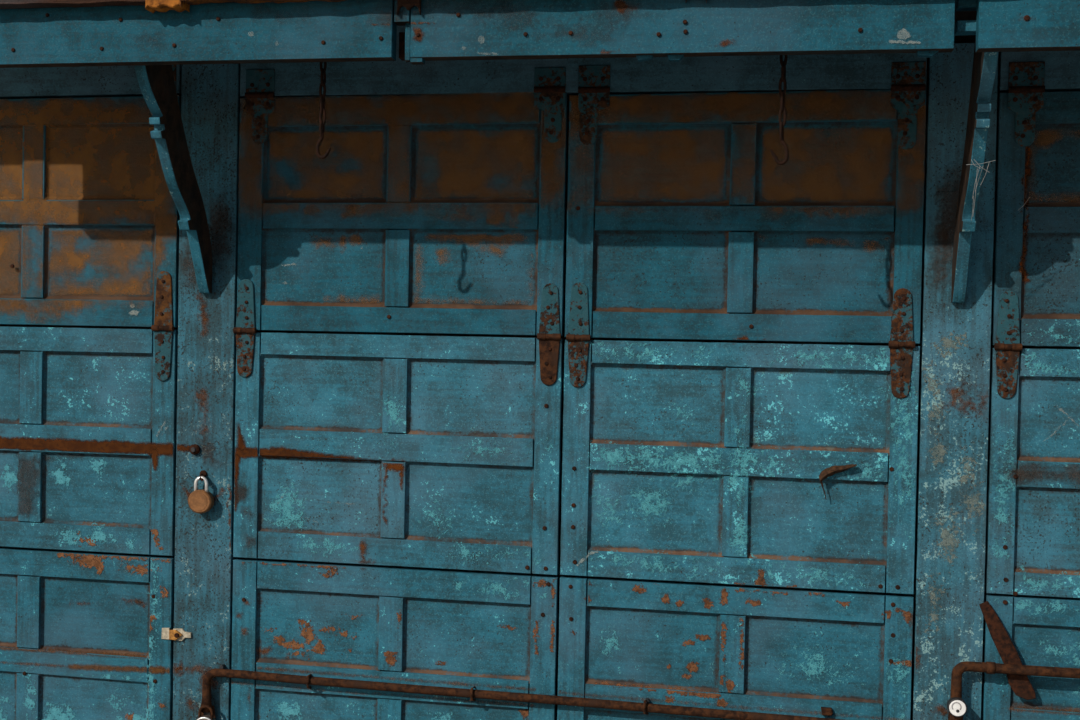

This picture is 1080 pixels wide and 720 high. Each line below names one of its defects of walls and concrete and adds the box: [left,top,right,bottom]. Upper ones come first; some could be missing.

corrosion [1019,146,1032,282]
corrosion [0,391,213,470]
peeling [52,457,107,486]
peeling [585,354,871,609]
peeling [0,666,88,720]
peeling [266,701,313,720]
peeling [260,614,362,660]
peeling [383,651,398,666]
peeling [595,661,735,707]
peeling [682,622,728,662]
peeling [766,642,864,691]
peeling [886,657,912,720]